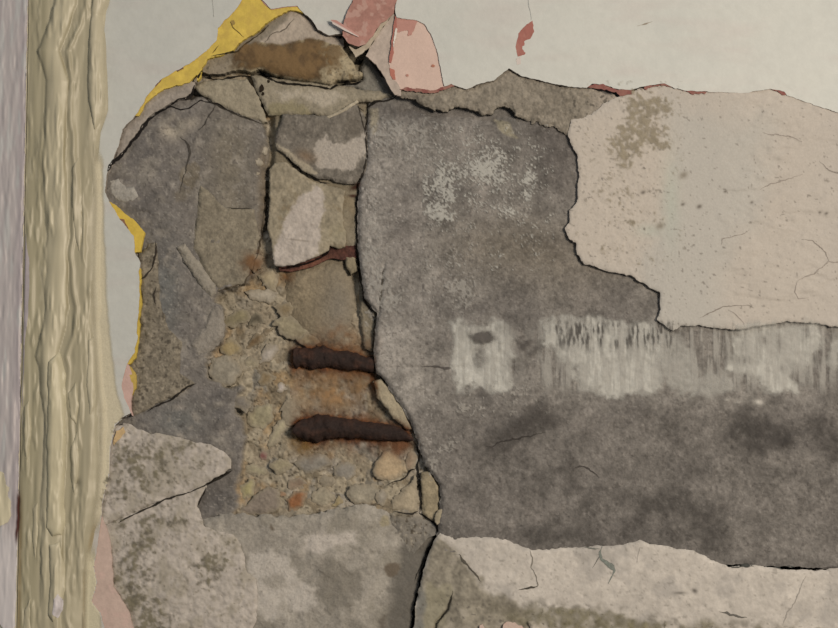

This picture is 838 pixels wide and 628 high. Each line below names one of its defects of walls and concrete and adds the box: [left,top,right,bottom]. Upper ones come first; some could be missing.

crack [107,19,366,190]
crack [355,95,396,358]
efflorescence [423,135,541,228]
peeling [0,0,30,628]
crack [119,471,231,523]
spalling [92,0,442,628]
corrosion [291,344,376,404]
corrosion [293,413,411,454]
crack [388,441,438,628]
flaking render [235,0,838,628]
leakage [519,317,663,398]
leakage [726,323,821,393]